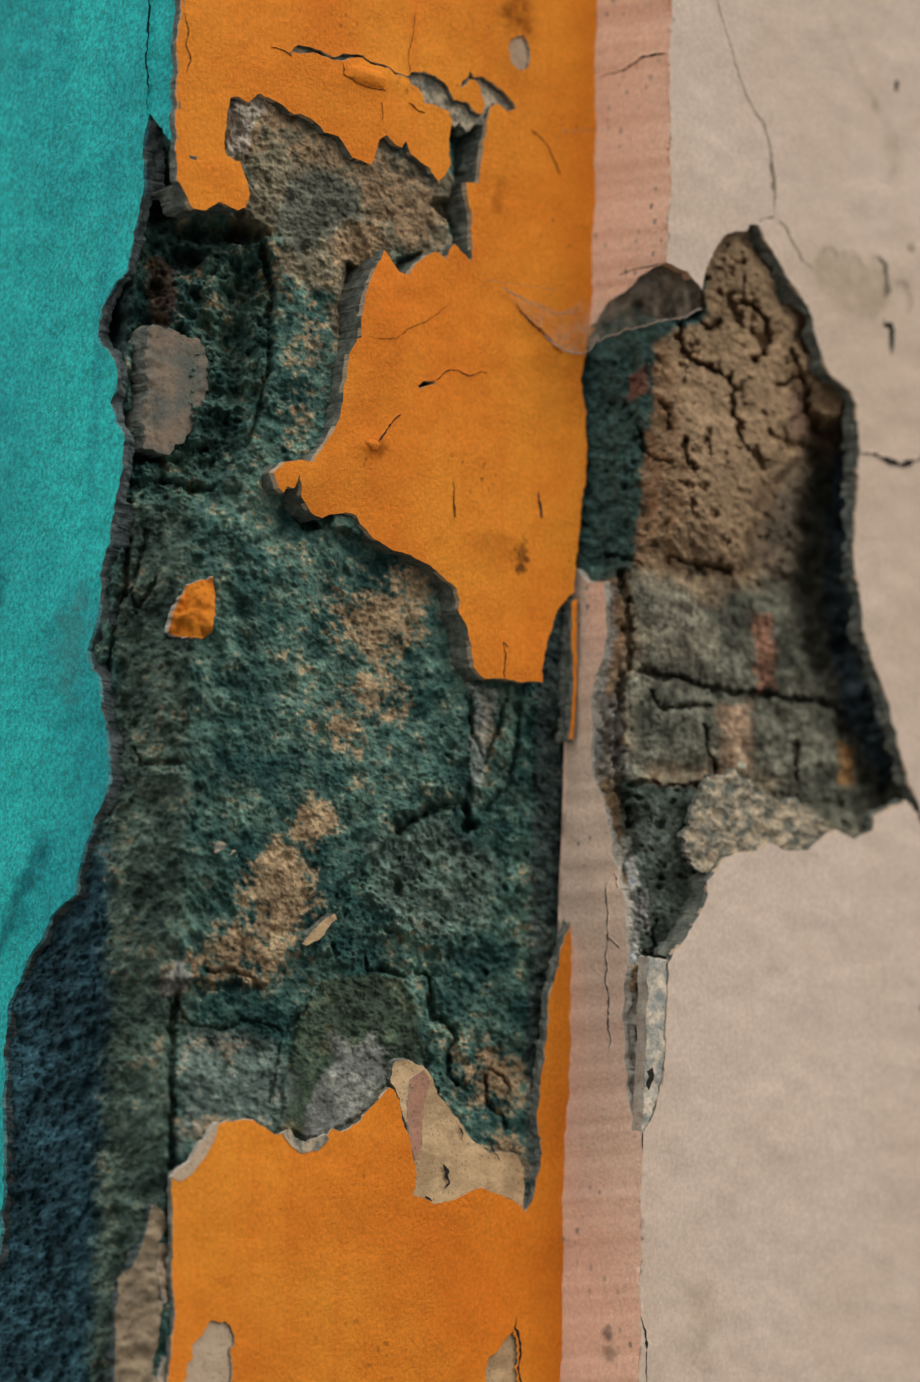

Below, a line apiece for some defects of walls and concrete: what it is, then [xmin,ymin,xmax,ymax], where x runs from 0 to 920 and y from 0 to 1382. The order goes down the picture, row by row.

crack [272,46,292,56]
flaking render [292,47,355,60]
peeling [509,36,528,70]
crack [599,52,668,78]
crack [717,0,811,267]
crack [859,450,920,471]
flaking render [576,230,913,1133]
flaking render [0,74,572,1382]